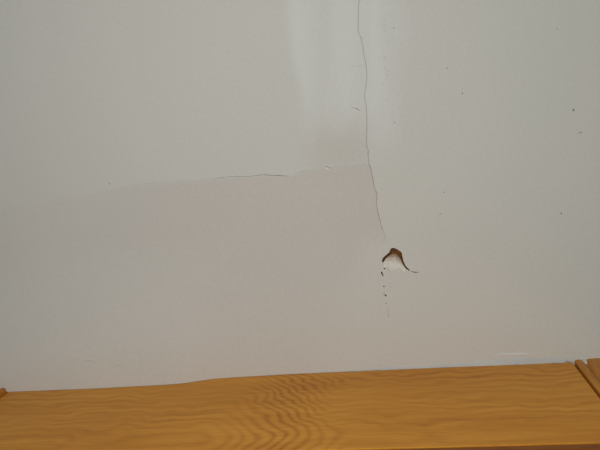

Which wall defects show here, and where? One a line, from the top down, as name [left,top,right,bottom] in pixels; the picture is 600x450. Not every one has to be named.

flaking render [381,248,414,278]